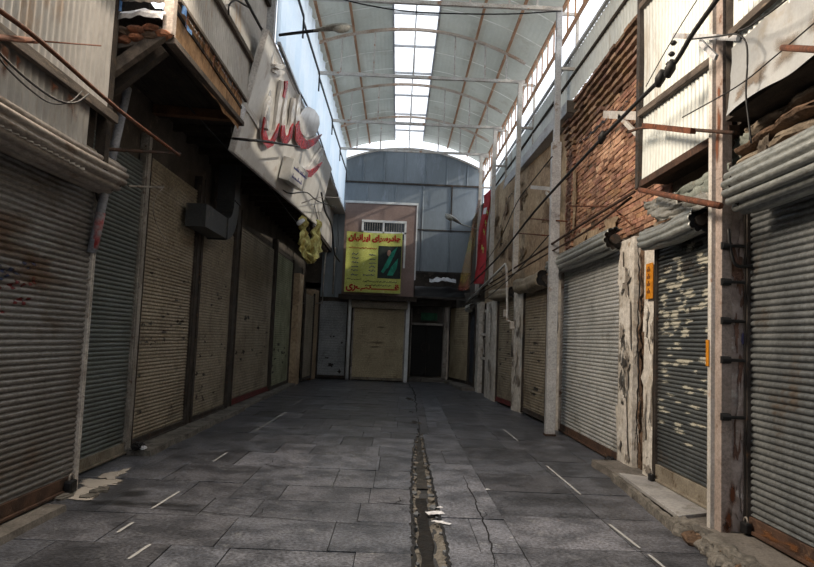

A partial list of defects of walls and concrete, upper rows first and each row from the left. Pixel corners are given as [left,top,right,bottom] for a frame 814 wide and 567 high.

flaking render [572,170,619,247]
flaking render [615,250,631,462]
crack [132,384,452,567]
crack [463,476,495,567]
rust [723,484,735,533]